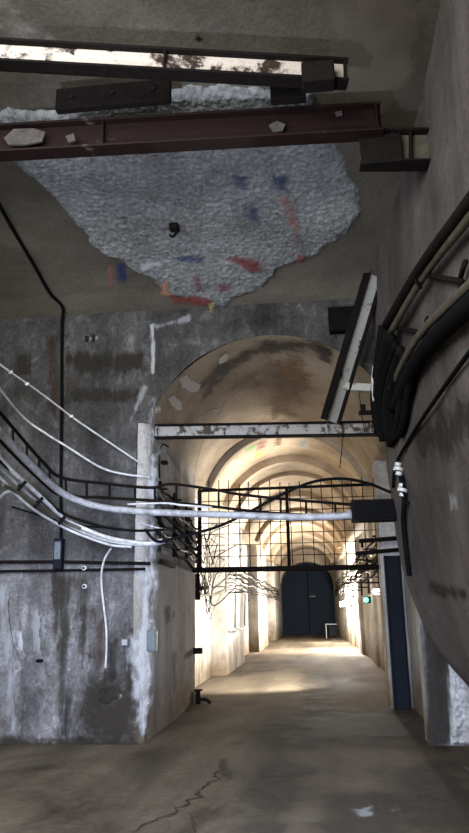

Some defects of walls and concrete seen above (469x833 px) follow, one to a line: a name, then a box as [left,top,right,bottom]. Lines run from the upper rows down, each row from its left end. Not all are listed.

water stain [146,430,156,509]
water stain [0,524,157,745]
crack [133,759,238,833]